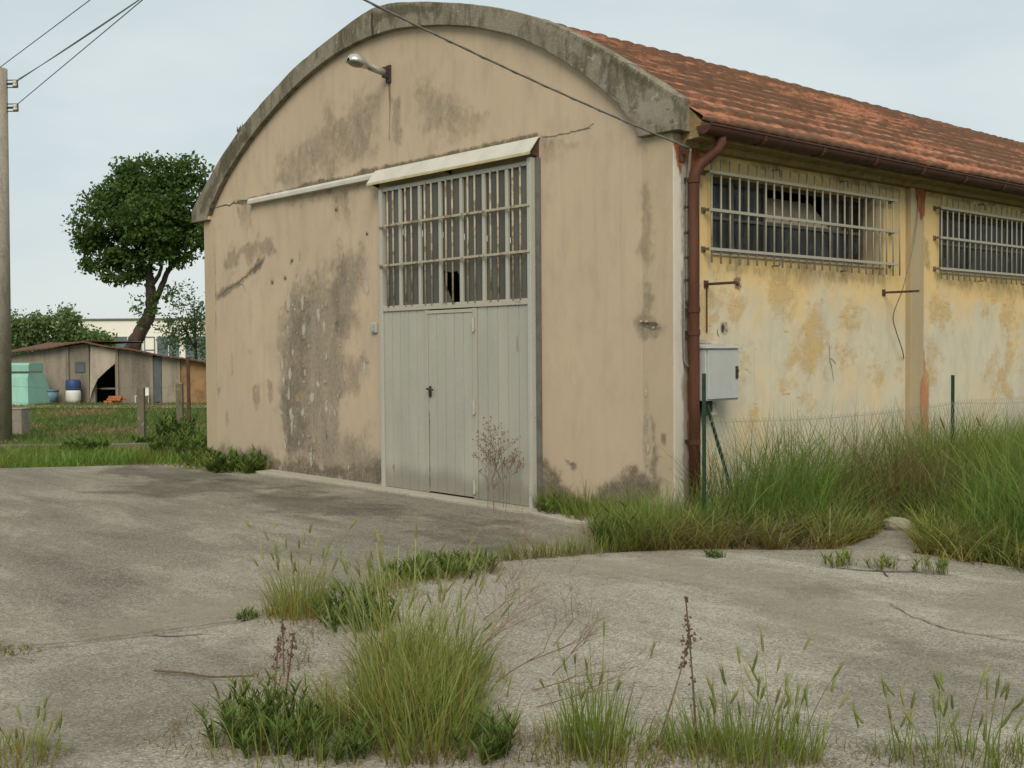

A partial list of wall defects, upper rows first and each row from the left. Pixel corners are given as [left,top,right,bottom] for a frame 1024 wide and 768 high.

crack [540,123,594,138]
corrosion [916,188,926,220]
crack [219,259,263,296]
corrosion [921,351,929,448]
leakage [247,451,381,484]
leakage [599,445,658,506]